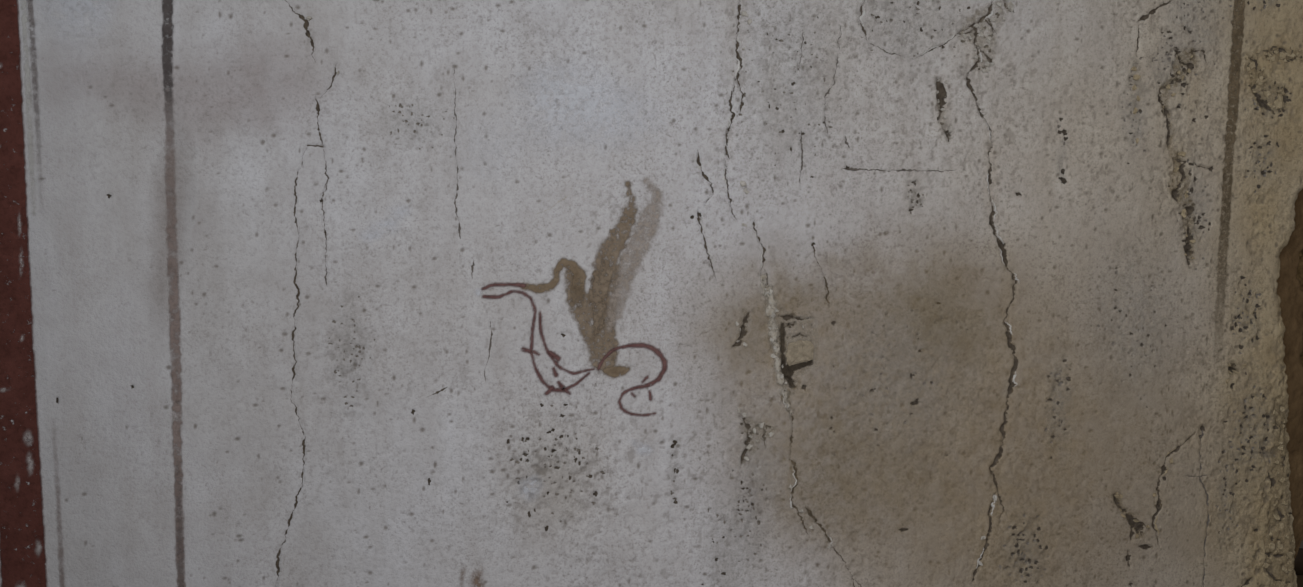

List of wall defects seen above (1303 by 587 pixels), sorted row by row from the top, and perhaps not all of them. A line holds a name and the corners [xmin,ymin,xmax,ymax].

crack [690,0,769,288]
crack [1131,1,1171,143]
spalling [1245,135,1279,193]
spalling [1245,46,1302,118]
crack [276,0,340,580]
crack [763,385,861,587]
crack [799,0,1019,581]
crack [1152,425,1210,587]
flaking render [1215,189,1303,587]